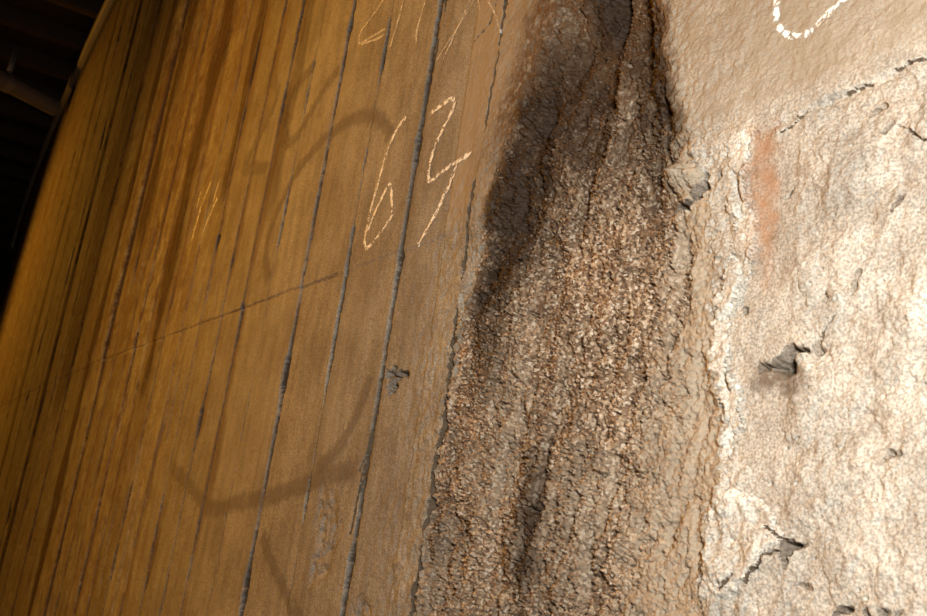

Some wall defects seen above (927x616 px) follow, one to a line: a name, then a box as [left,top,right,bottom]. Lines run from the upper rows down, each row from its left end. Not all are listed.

crack [847,83,874,96]
crack [895,57,927,72]
water stain [472,0,680,317]
spalling [415,0,808,616]
hole [757,340,827,376]
water stain [516,500,546,583]